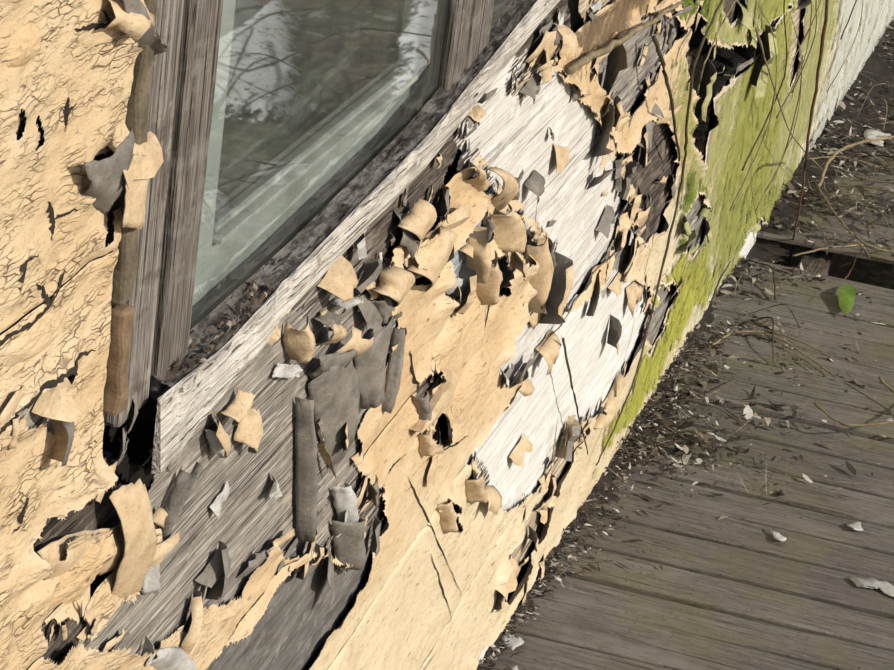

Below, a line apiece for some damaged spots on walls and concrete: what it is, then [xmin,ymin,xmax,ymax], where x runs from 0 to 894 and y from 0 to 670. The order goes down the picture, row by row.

crack [74,10,111,32]
peeling [685,0,778,122]
peeling [16,109,45,151]
crack [47,201,82,241]
damp [603,0,894,458]
peeling [740,222,761,258]
crack [0,256,66,346]
peeling [0,377,85,466]
crack [0,349,96,434]
peeling [26,0,712,670]
crack [409,350,419,392]
crack [389,454,461,620]